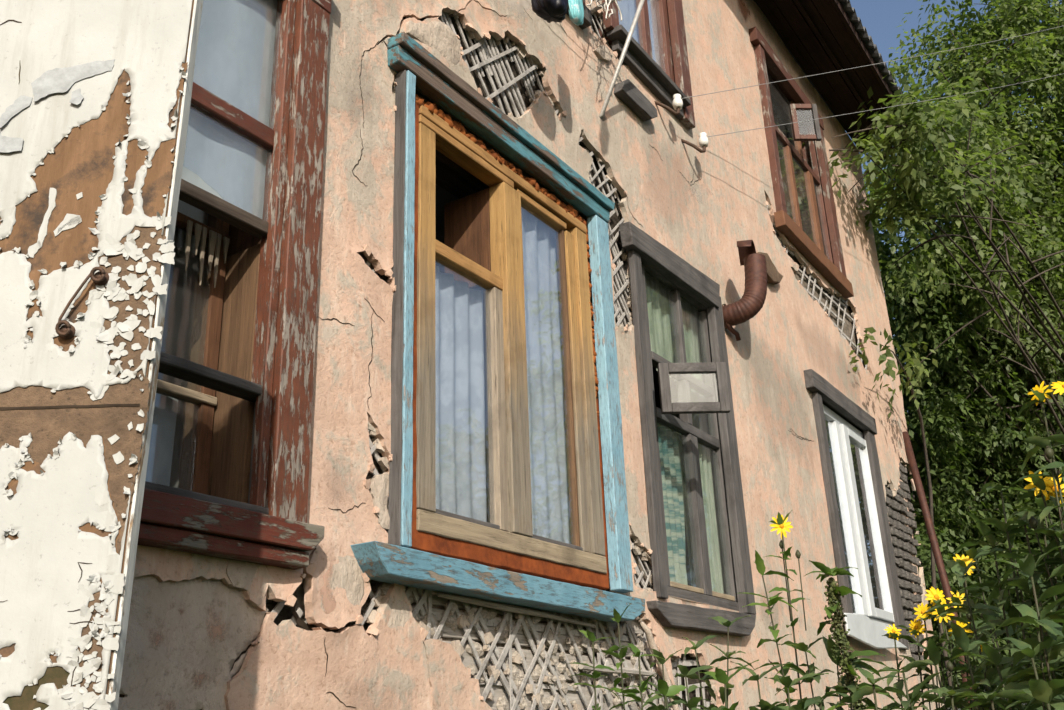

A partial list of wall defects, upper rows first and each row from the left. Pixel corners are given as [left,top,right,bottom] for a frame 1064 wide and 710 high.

crack [352,14,454,185]
flaking render [406,11,567,121]
peeling [0,59,188,555]
crack [322,298,385,408]
flaking render [578,137,633,331]
flaking render [766,201,875,378]
flaking render [363,421,392,533]
flaking render [41,559,317,710]
crack [230,644,251,671]
crack [291,589,364,708]
flaking render [349,573,720,710]
flaking render [885,461,925,661]